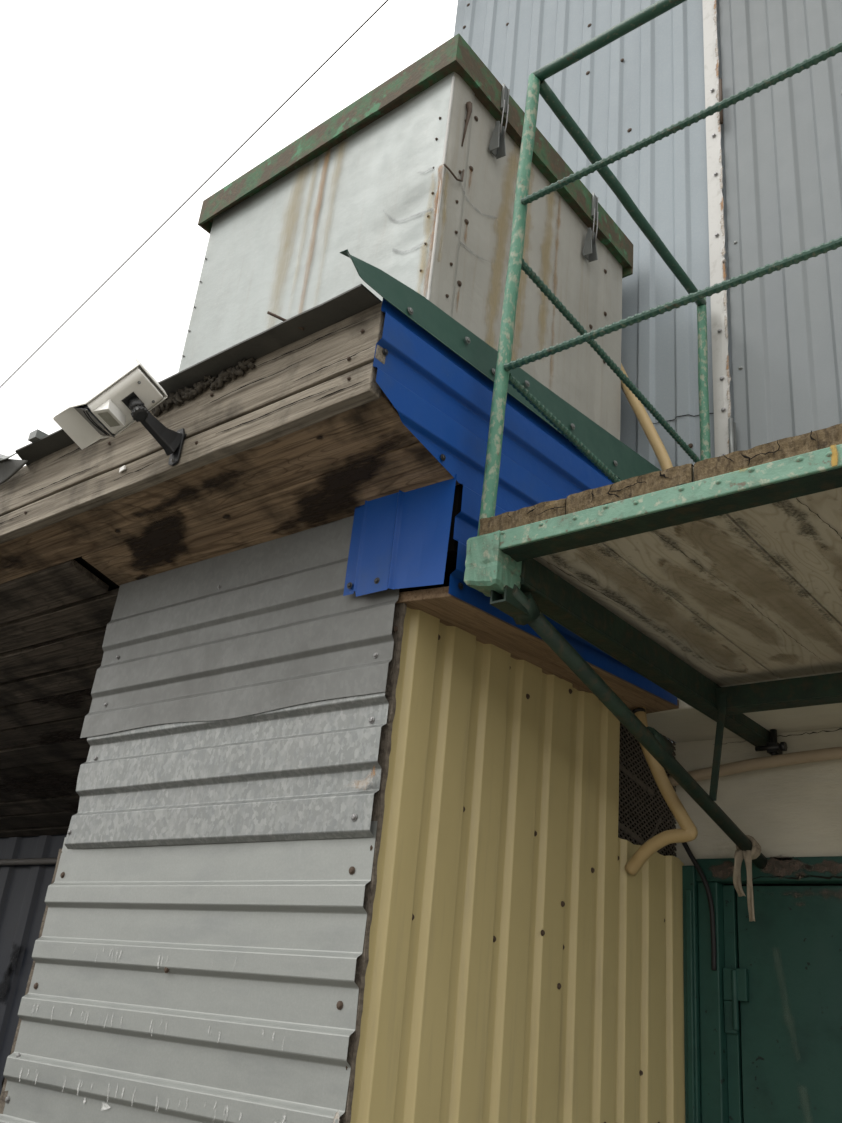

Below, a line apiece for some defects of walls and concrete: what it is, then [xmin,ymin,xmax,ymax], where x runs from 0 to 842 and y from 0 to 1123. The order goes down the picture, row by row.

rust [314,151,329,224]
leakage [124,471,239,580]
leakage [273,435,406,533]
crack [752,857,842,880]